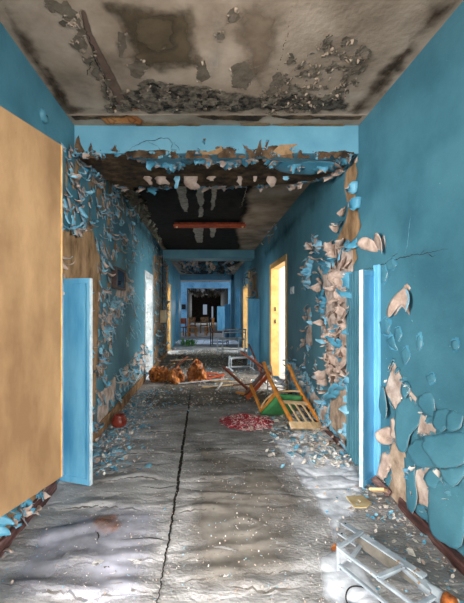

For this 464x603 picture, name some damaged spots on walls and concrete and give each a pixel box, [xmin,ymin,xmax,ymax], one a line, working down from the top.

peeling [44,0,372,126]
damp [81,3,364,114]
damp [370,48,412,95]
damp [427,6,449,24]
peeling [61,135,385,450]
peeling [387,283,410,318]
crack [368,224,442,269]
crack [123,390,227,603]
peeling [375,358,464,549]